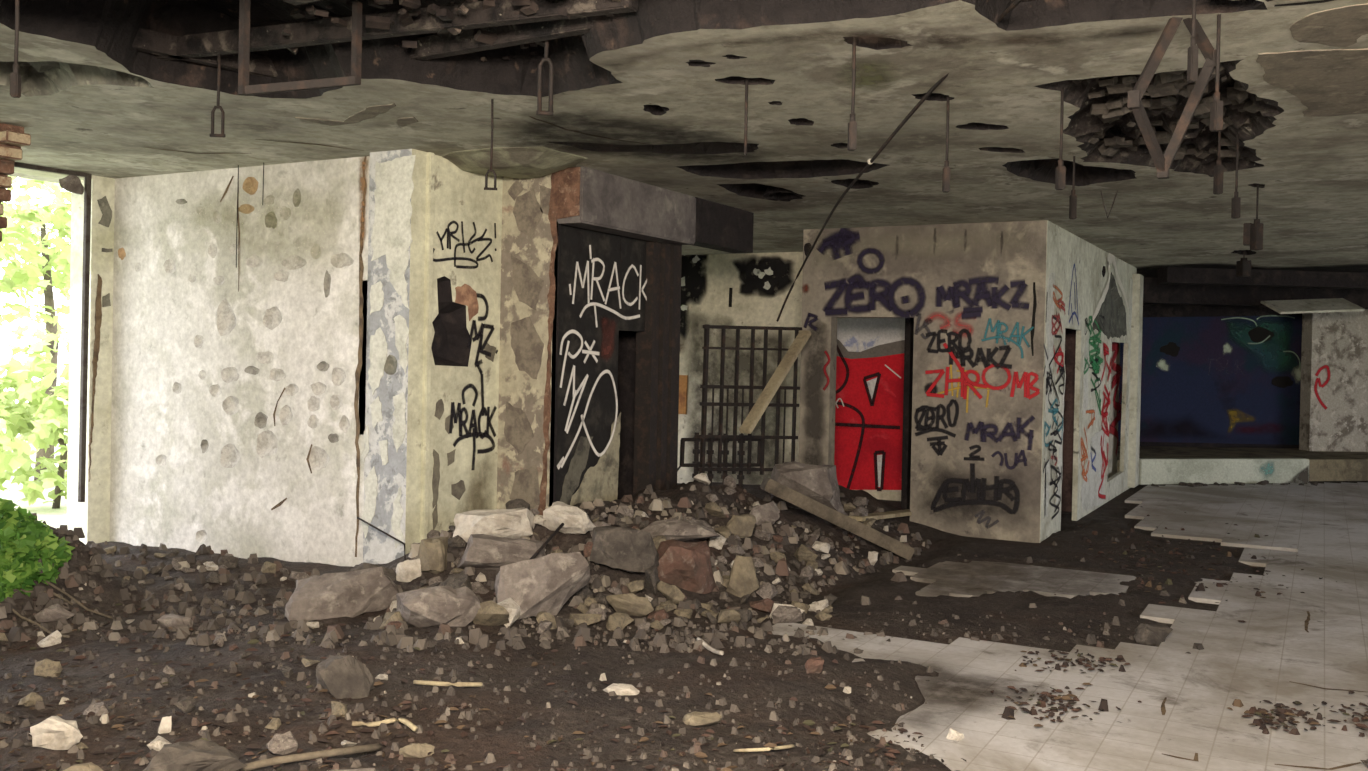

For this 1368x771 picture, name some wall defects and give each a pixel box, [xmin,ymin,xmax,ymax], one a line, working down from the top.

spalling [0,0,1267,99]
peeling [295,103,418,127]
spalling [643,105,669,116]
spalling [686,54,814,126]
spalling [911,93,954,101]
spalling [956,122,1008,130]
spalling [979,3,1368,188]
flaking render [0,130,31,242]
spalling [97,196,112,227]
flaking render [102,248,141,272]
spalling [89,274,111,482]
peeling [194,155,416,561]